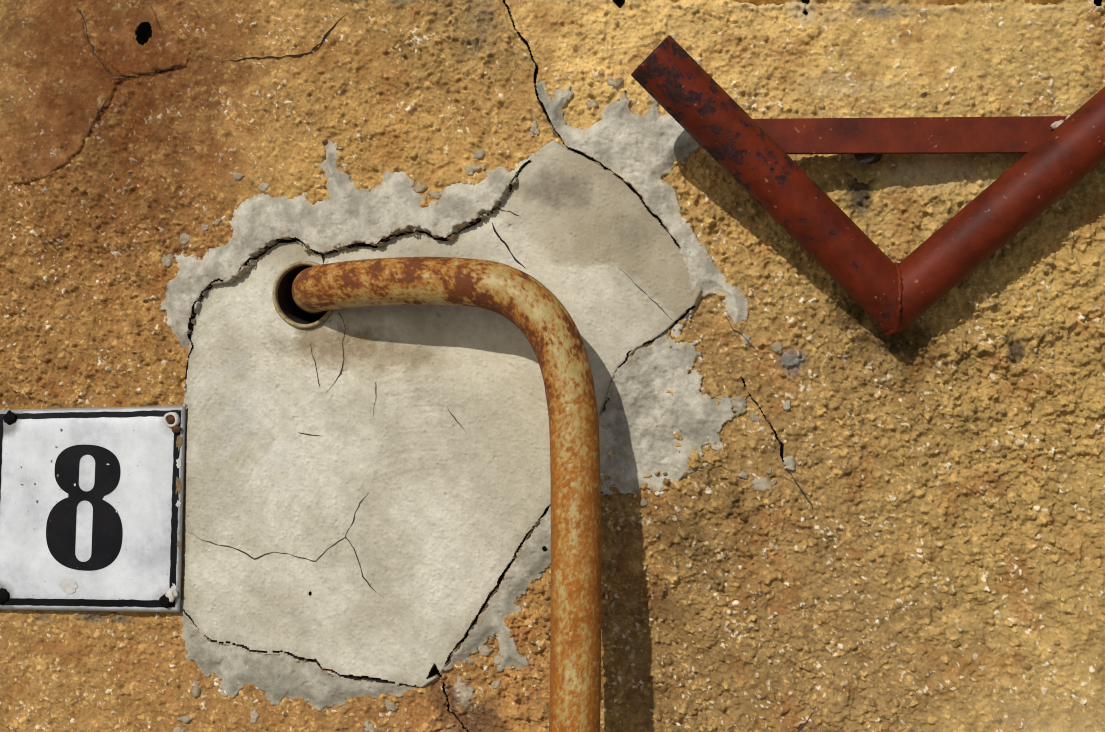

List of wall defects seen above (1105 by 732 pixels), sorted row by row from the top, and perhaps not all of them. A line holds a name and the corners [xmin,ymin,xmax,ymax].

crack [78,10,181,134]
crack [222,15,345,62]
crack [503,0,681,249]
peeling [160,140,543,350]
peeling [536,80,749,497]
crack [618,268,696,367]
crack [741,376,813,511]
peeling [171,506,551,712]
crack [183,492,551,732]